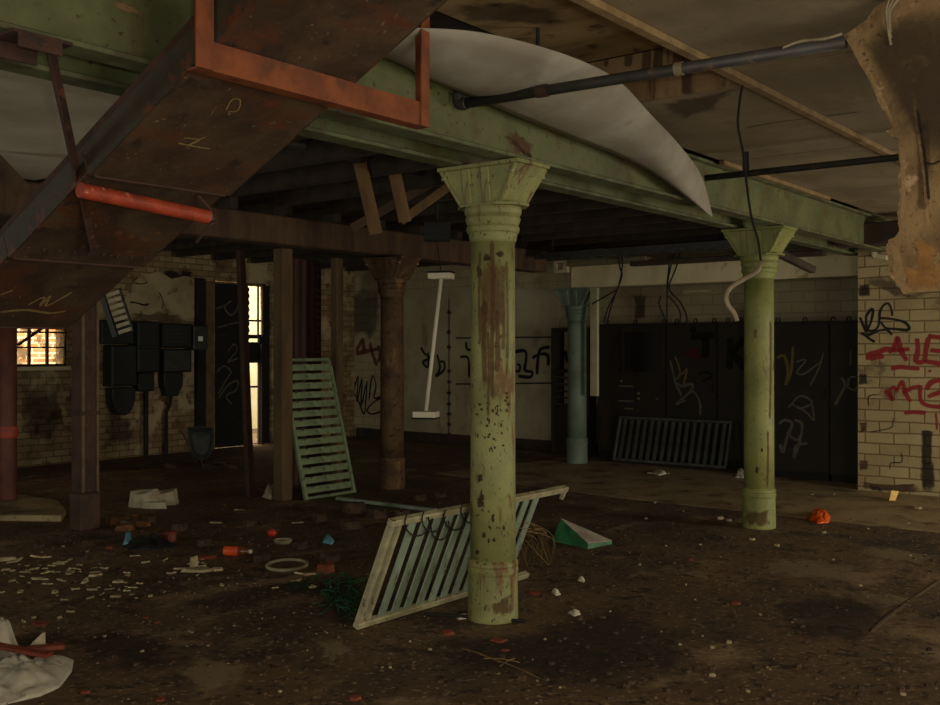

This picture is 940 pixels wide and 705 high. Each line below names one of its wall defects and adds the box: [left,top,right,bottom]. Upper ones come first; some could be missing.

peeling [125,272,194,322]
corrosion [477,242,509,415]
corrosion [492,597,511,614]